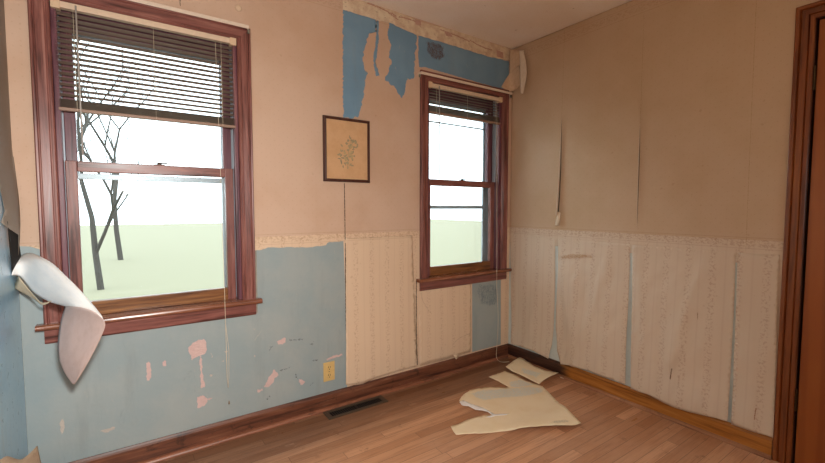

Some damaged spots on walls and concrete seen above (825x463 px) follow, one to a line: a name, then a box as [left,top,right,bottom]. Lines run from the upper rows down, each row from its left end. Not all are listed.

flaking render [343,0,512,60]
peeling [188,339,213,408]